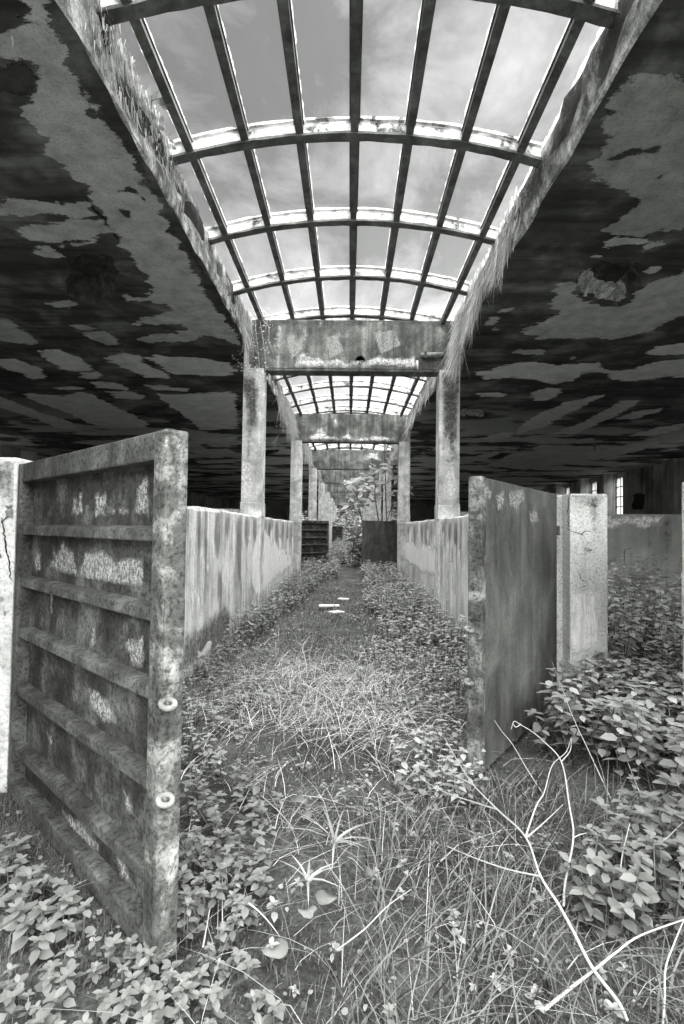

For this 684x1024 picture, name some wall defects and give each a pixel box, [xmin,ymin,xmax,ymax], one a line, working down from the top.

flaking render [0,0,242,464]
flaking render [476,71,684,470]
spalling [460,392,506,419]
crack [0,516,12,580]
leakage [190,510,293,623]
leakage [406,524,461,590]